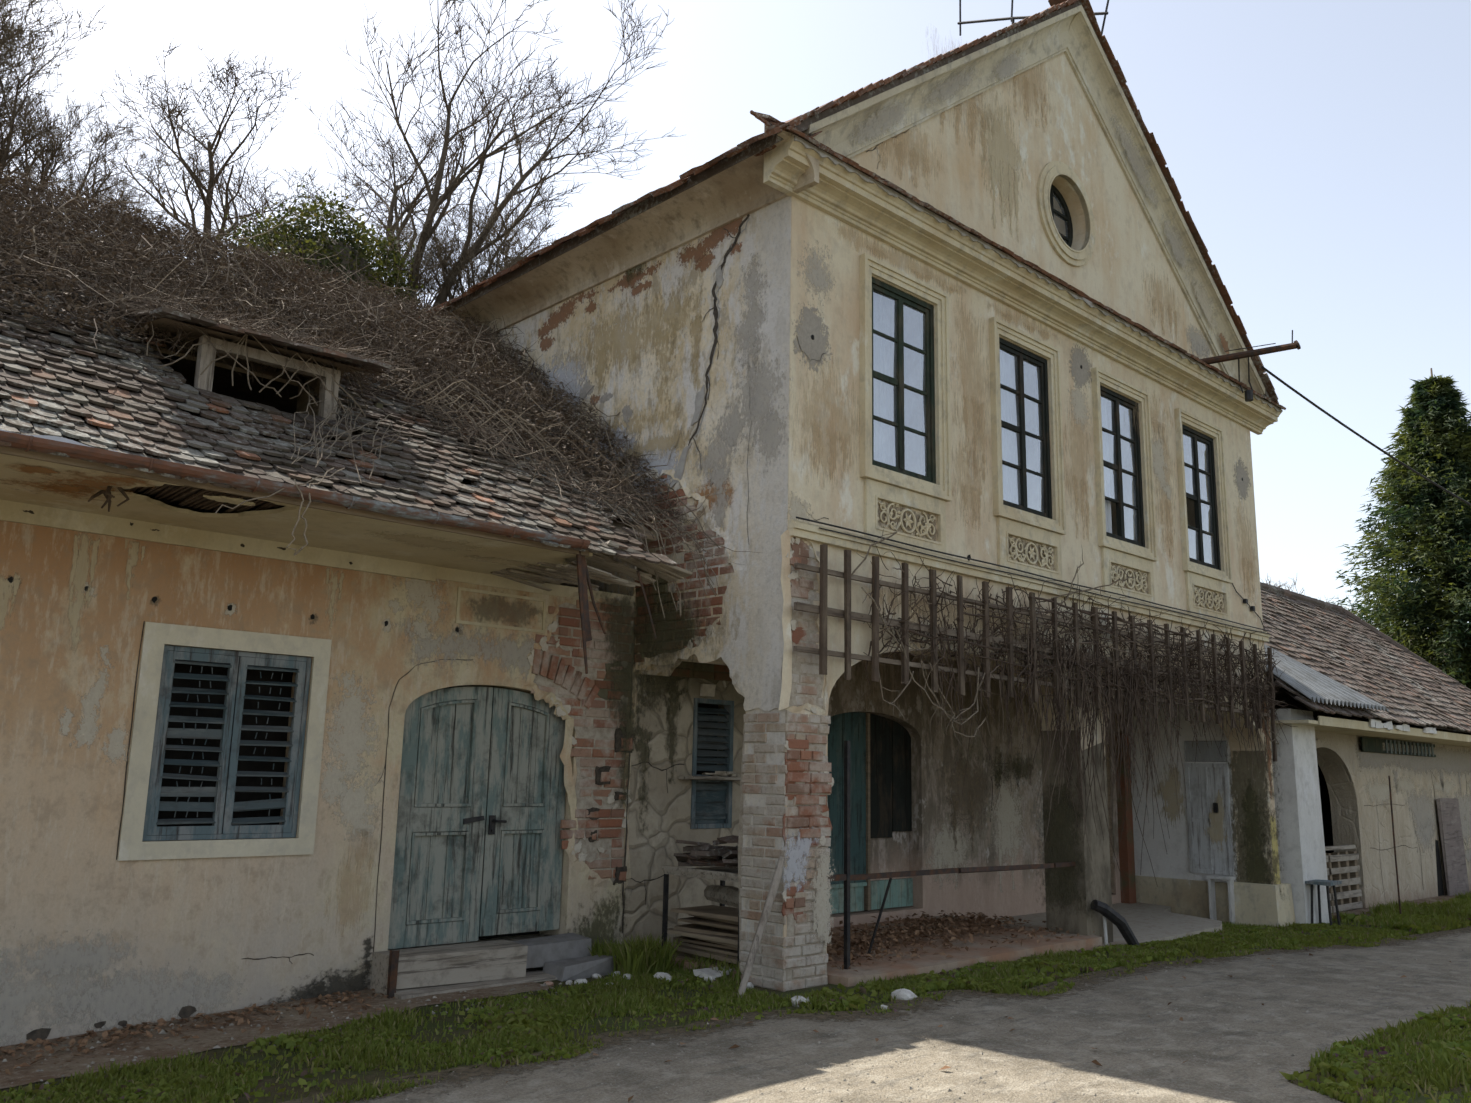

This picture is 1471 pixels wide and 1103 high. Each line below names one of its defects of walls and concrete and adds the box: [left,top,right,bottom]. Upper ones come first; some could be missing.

peeling [538,217,743,351]
crack [688,214,750,465]
damp [979,104,1023,237]
flaking render [794,135,1283,412]
flaking render [203,495,255,506]
spalling [524,468,743,894]
flaking render [738,529,834,992]